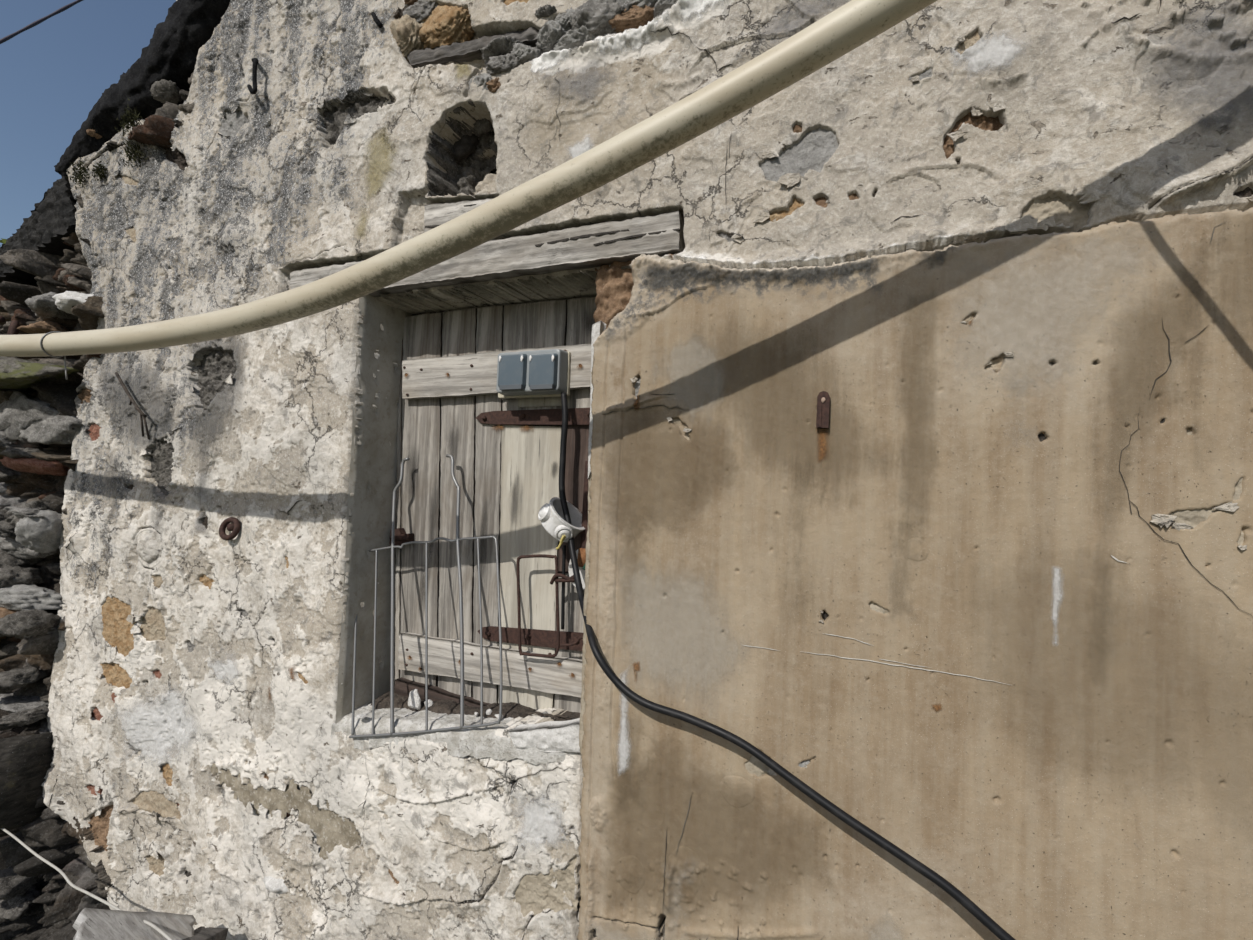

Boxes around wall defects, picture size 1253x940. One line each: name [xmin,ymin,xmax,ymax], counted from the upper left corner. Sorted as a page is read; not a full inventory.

crack [1111,0,1162,24]
spalling [390,0,678,197]
spalling [943,103,1007,165]
spalling [753,124,839,223]
spalling [1233,187,1253,202]
water stain [646,235,965,290]
crack [1119,320,1253,617]
spalling [1150,477,1243,531]
water stain [1053,568,1062,621]
water stain [619,675,629,771]
crack [467,747,574,807]
crack [461,835,521,904]